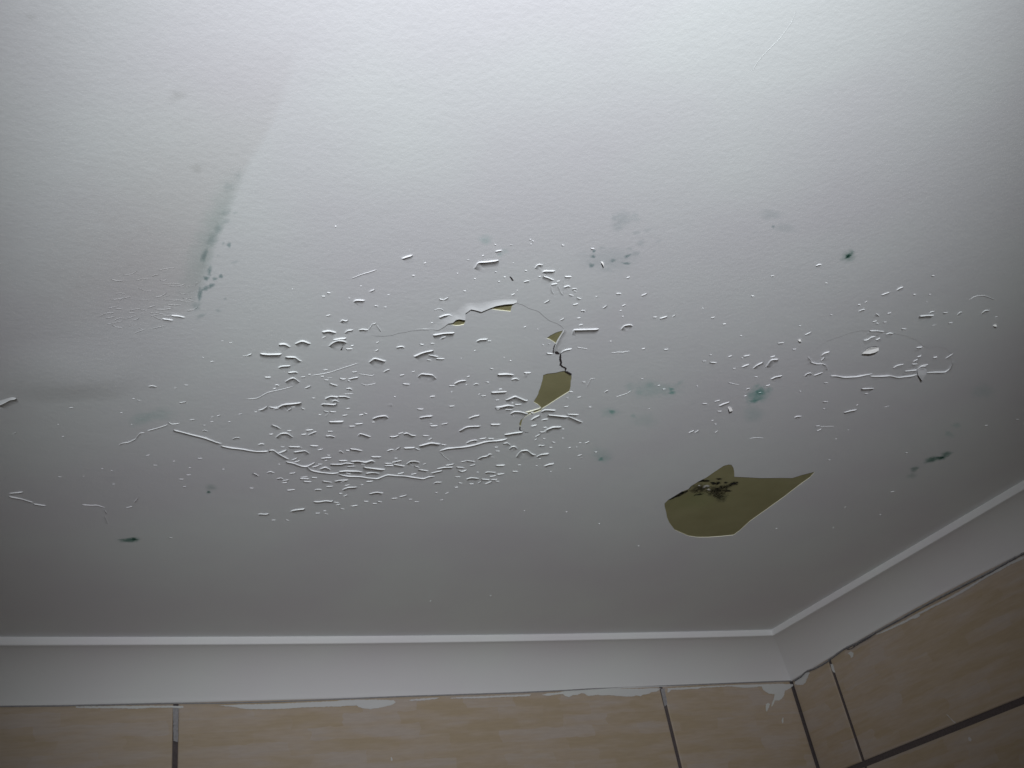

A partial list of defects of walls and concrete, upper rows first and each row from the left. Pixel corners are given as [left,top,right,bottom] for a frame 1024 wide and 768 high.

peeling [421,299,517,330]
crack [510,277,572,375]
peeling [546,330,571,352]
peeling [805,330,956,381]
peeling [519,371,572,433]
peeling [665,465,814,537]